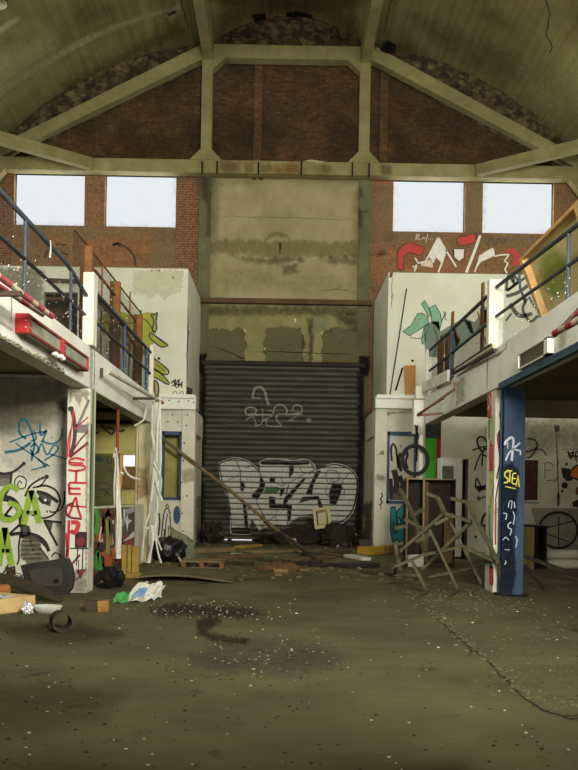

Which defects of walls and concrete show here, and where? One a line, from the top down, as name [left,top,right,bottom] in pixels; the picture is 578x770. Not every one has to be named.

peeling [133,270,183,300]
leakage [209,307,357,362]
crack [423,605,578,721]